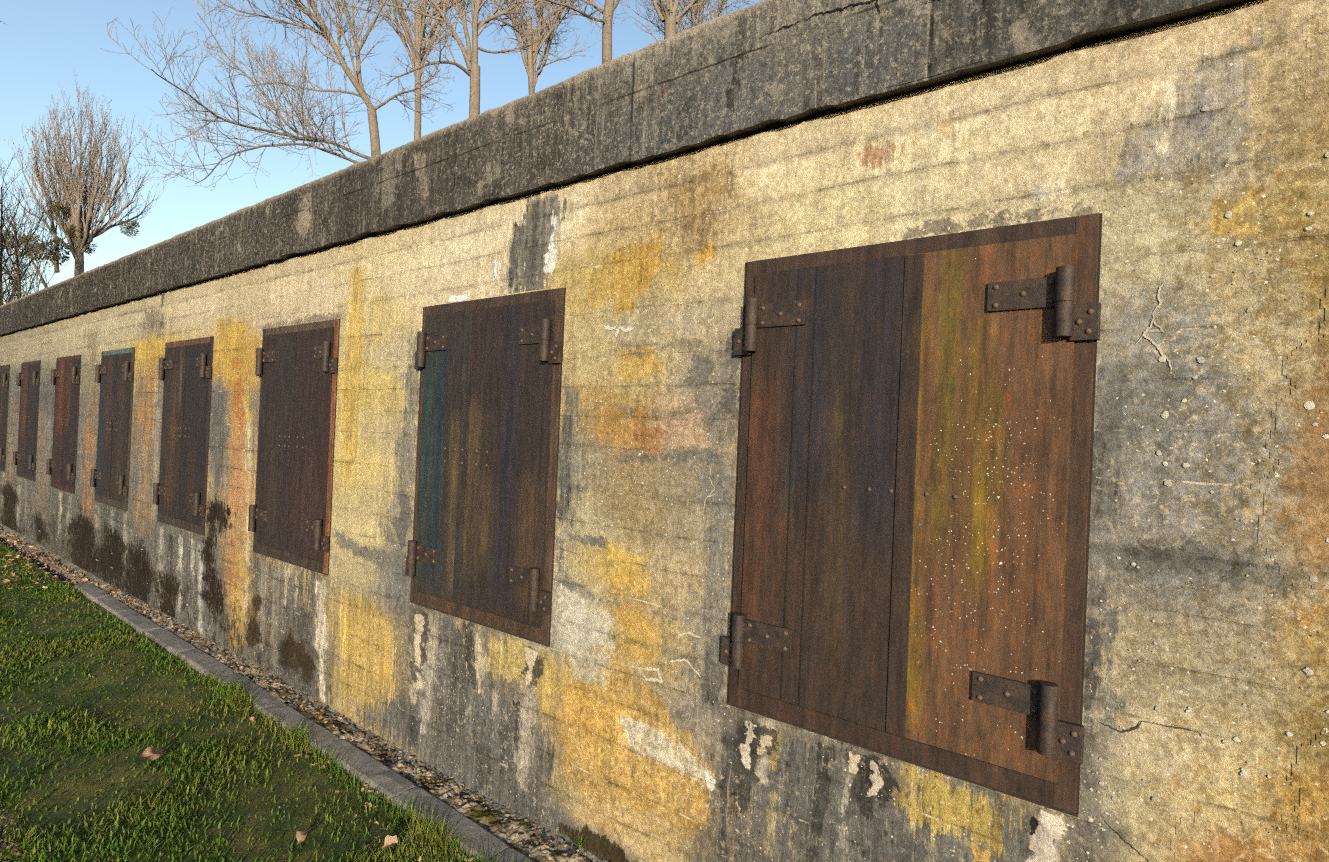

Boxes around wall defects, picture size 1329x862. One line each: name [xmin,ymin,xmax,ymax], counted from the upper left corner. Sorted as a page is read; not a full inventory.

damp [291,182,317,246]
damp [369,145,430,218]
damp [489,0,861,296]
damp [21,318,110,559]
damp [99,293,176,539]
damp [155,505,228,649]
damp [206,372,225,504]
damp [247,222,1056,862]
damp [878,8,1329,751]